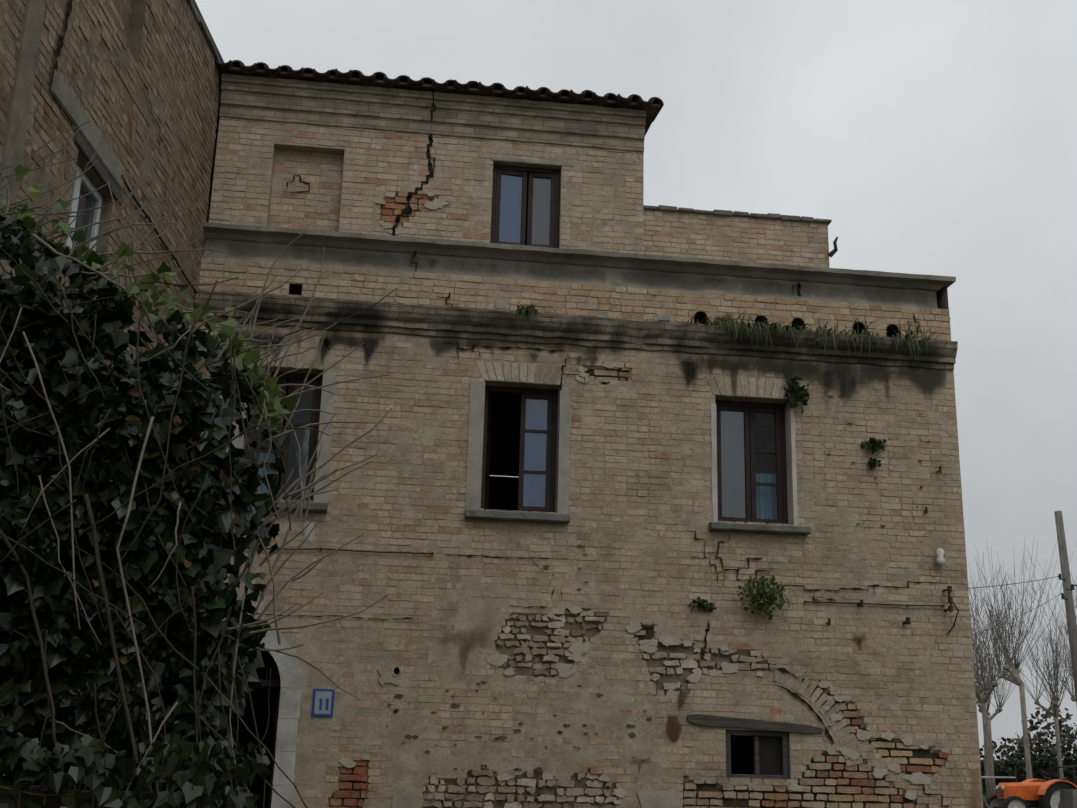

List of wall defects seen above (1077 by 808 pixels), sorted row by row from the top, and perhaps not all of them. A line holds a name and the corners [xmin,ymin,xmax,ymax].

crack [391,90,436,271]
spalling [375,192,449,235]
leakage [235,298,291,358]
leakage [320,303,382,364]
crack [442,342,585,390]
spalling [486,605,608,693]
spalling [626,621,777,698]
spalling [683,679,949,808]
spalling [328,755,370,808]
spalling [423,765,627,808]